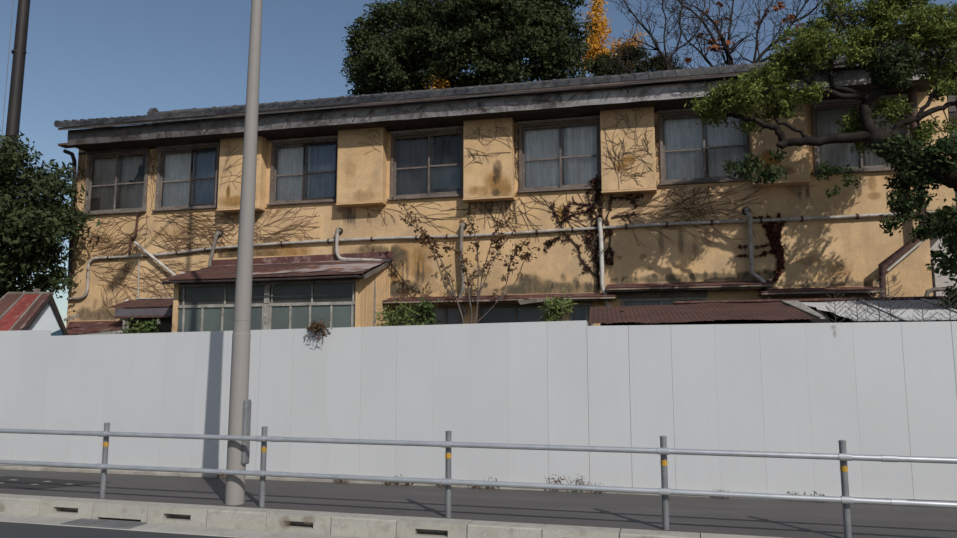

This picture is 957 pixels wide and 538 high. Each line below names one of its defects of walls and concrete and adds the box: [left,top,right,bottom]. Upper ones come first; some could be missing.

leakage [485,167,515,212]
leakage [360,245,427,297]
leakage [507,275,600,294]
leakage [613,270,775,284]